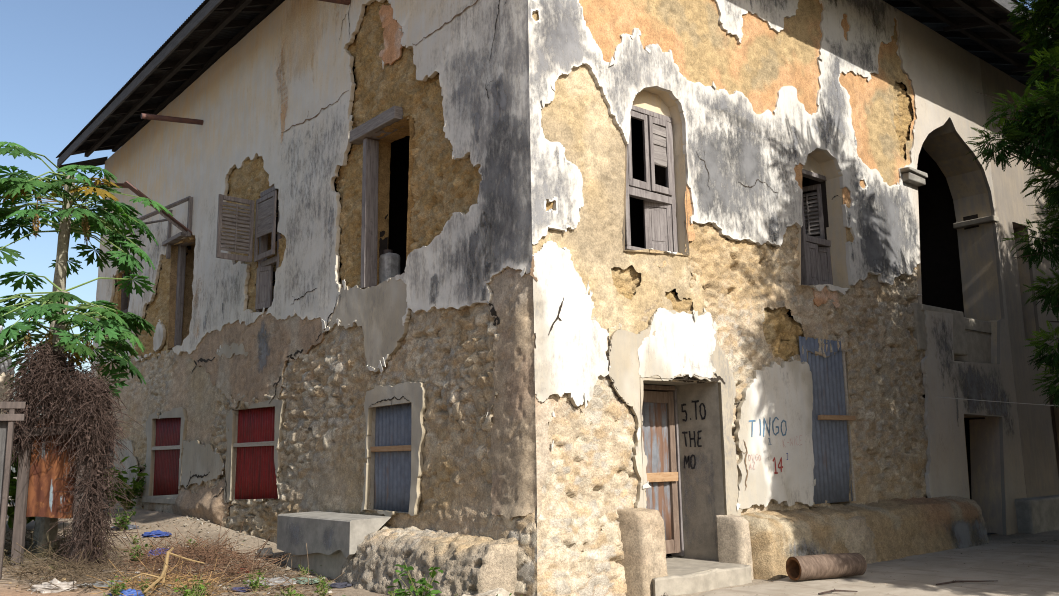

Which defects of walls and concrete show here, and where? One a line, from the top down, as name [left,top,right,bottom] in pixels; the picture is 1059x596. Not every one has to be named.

crack [284,90,349,132]
flaking render [347,0,482,252]
crack [412,0,506,99]
damp [443,51,572,301]
crack [530,256,538,281]
crack [548,298,564,335]
damp [528,0,600,105]
flaking render [520,65,816,516]
flaking render [579,0,824,115]
damp [688,93,798,241]
flaking render [839,14,916,190]
damp [843,157,917,277]